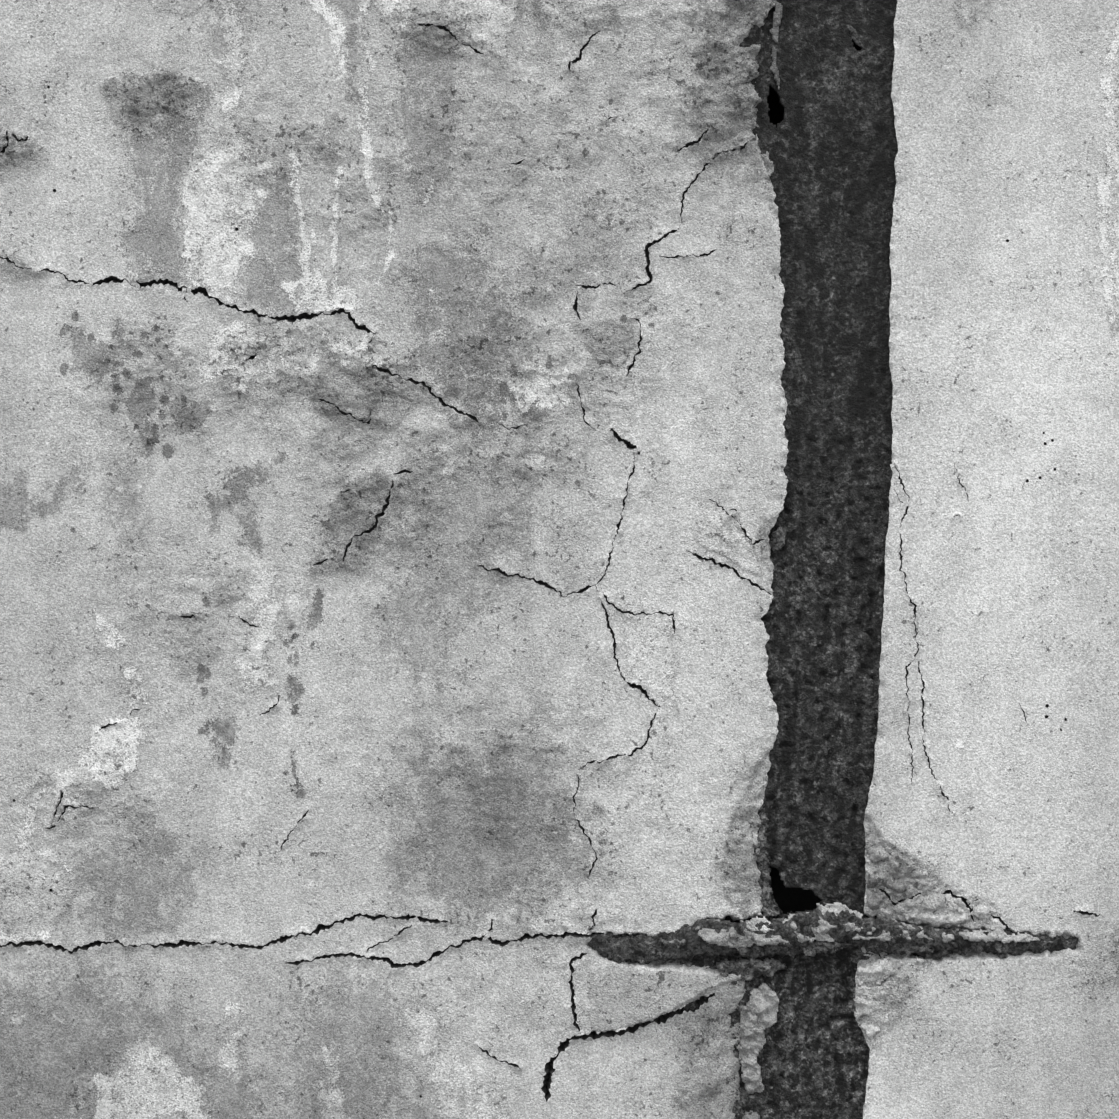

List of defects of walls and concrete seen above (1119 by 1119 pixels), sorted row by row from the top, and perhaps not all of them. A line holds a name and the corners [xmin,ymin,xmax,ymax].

crack [570,130,750,377]
crack [0,255,526,430]
crack [99,707,143,731]
crack [177,612,197,621]
crack [312,468,416,566]
crack [477,374,677,876]
crack [686,499,773,595]
crack [889,462,951,812]
crack [45,790,101,832]
crack [280,810,309,852]
crack [0,909,714,1103]
spalling [802,807,1055,1054]